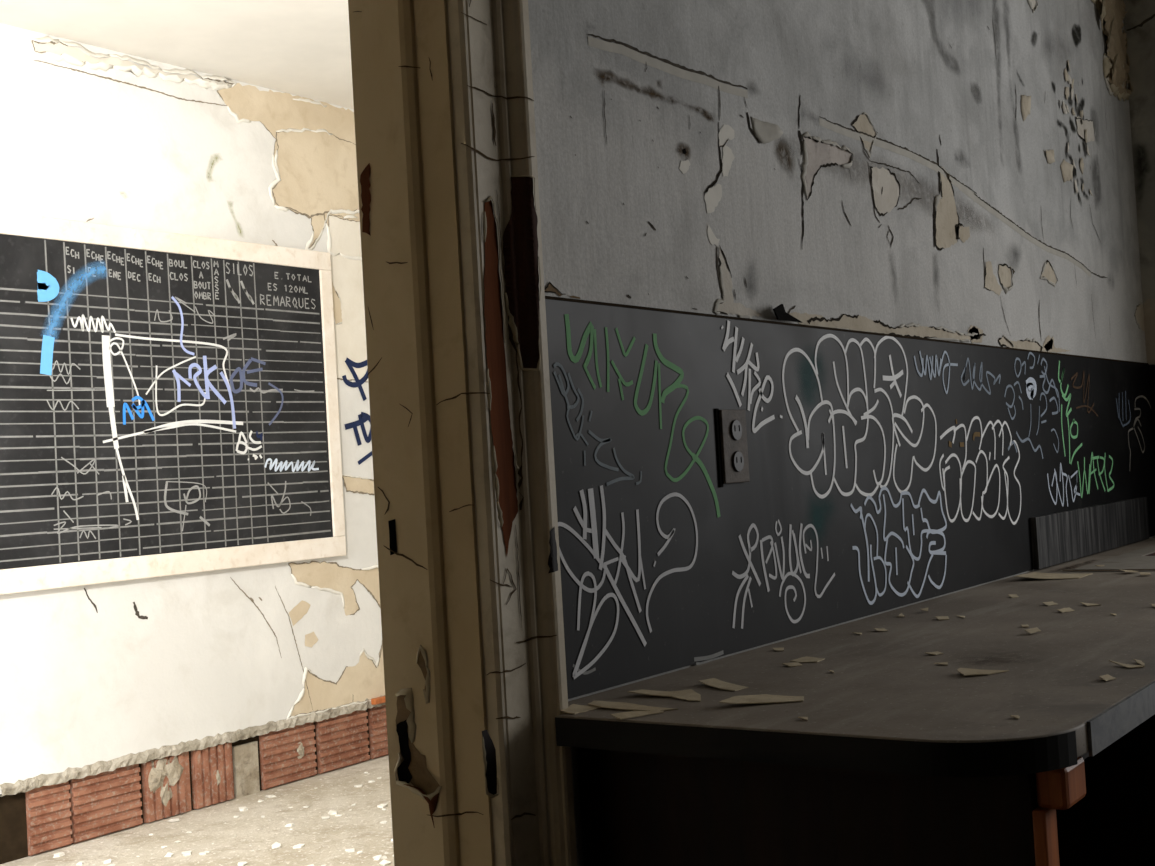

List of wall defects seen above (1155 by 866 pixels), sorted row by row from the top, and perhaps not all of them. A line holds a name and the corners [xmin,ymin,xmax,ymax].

peeling [1072,25,1081,46]
peeling [1091,0,1133,102]
peeling [31,35,371,382]
peeling [801,112,900,217]
peeling [935,166,970,251]
crack [798,97,1110,336]
peeling [1046,59,1095,202]
peeling [342,475,374,495]
peeling [305,631,318,648]
peeling [288,561,381,626]
peeling [416,645,430,704]
flaking render [0,645,388,864]